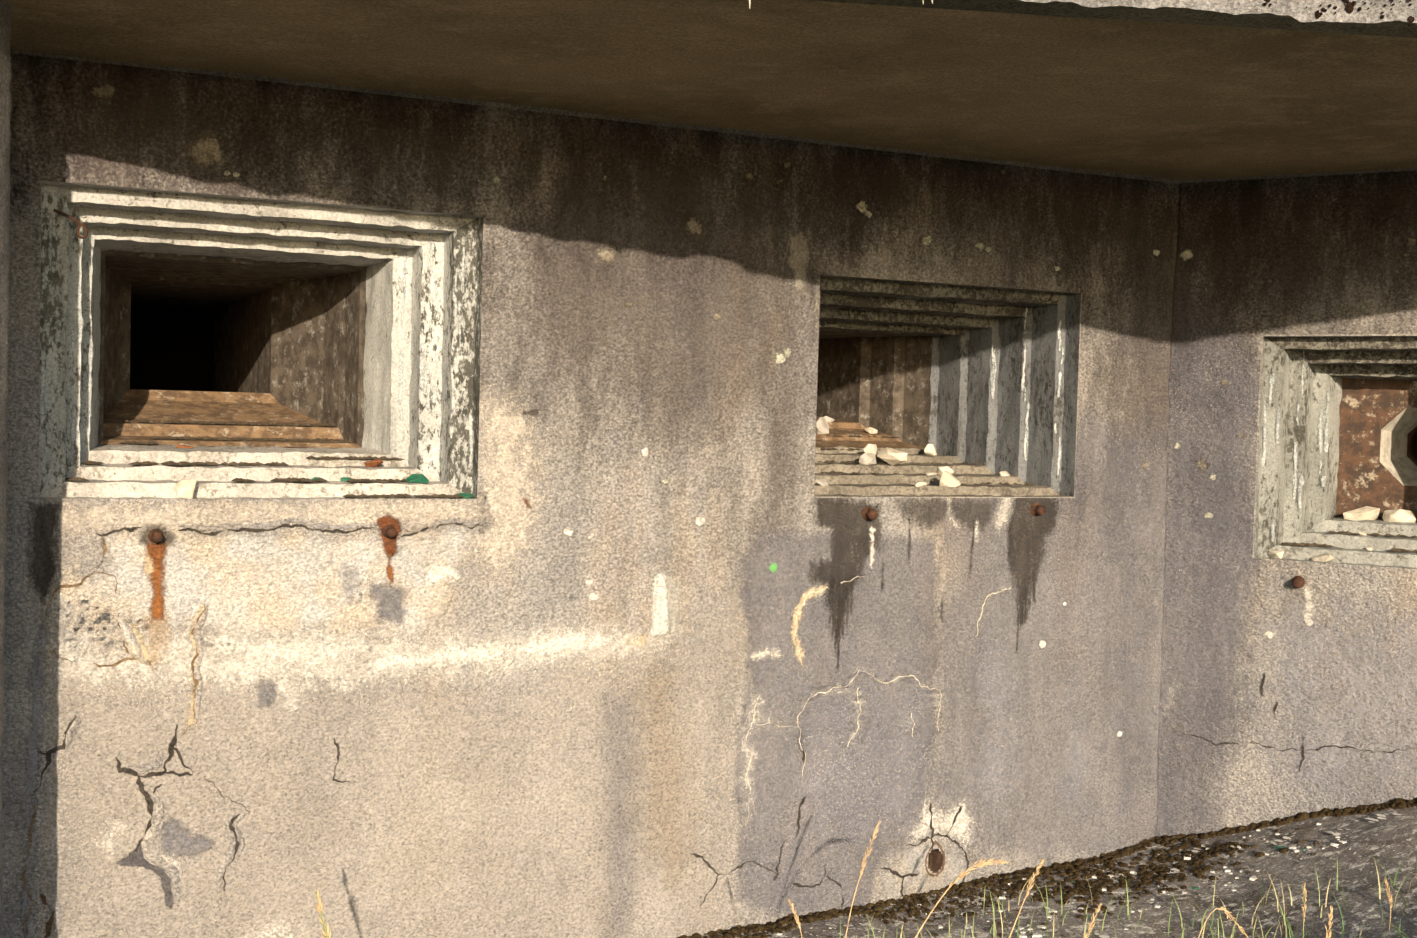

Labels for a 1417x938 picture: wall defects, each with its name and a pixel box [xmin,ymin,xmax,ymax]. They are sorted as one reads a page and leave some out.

water stain [28,56,508,212]
peeling [39,233,93,460]
peeling [435,240,466,354]
crack [45,527,141,662]
corrosion [140,525,174,619]
crack [178,518,484,538]
corrosion [377,515,401,582]
water stain [511,115,1417,838]
peeling [1261,351,1330,508]
crack [115,604,250,908]
crack [690,576,942,908]
crack [881,801,974,897]